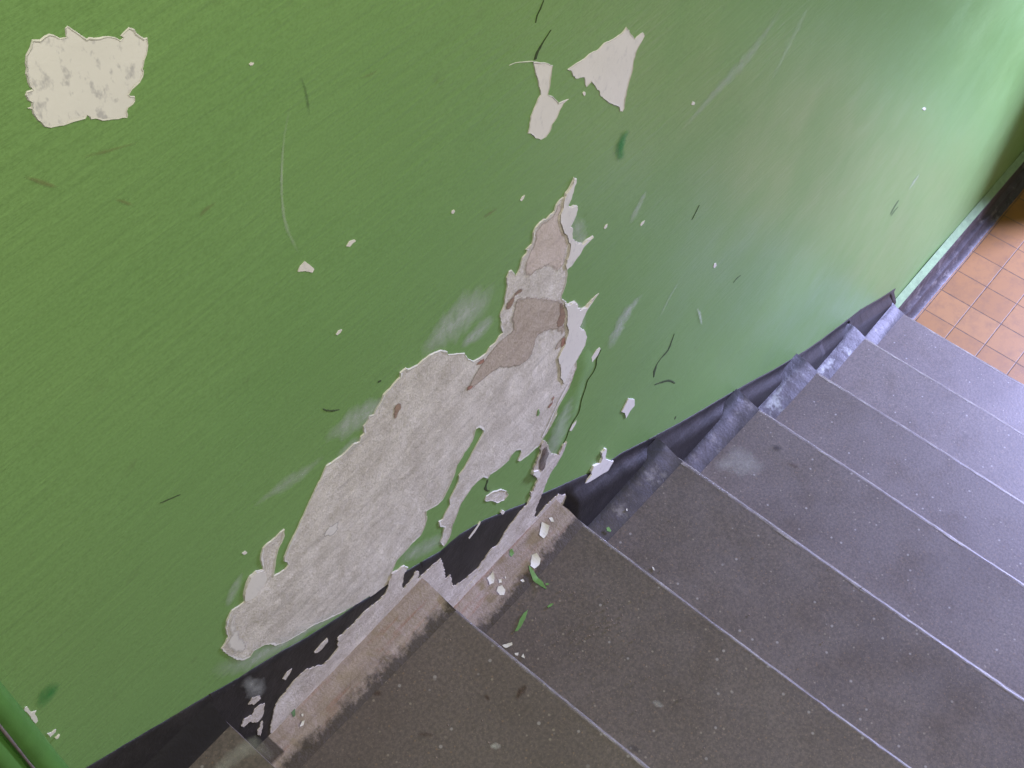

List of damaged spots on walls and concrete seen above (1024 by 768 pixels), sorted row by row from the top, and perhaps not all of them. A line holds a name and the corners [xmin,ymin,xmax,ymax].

peeling [25,26,148,128]
peeling [528,62,569,140]
peeling [568,27,645,112]
spalling [221,177,600,736]
peeling [585,448,614,483]